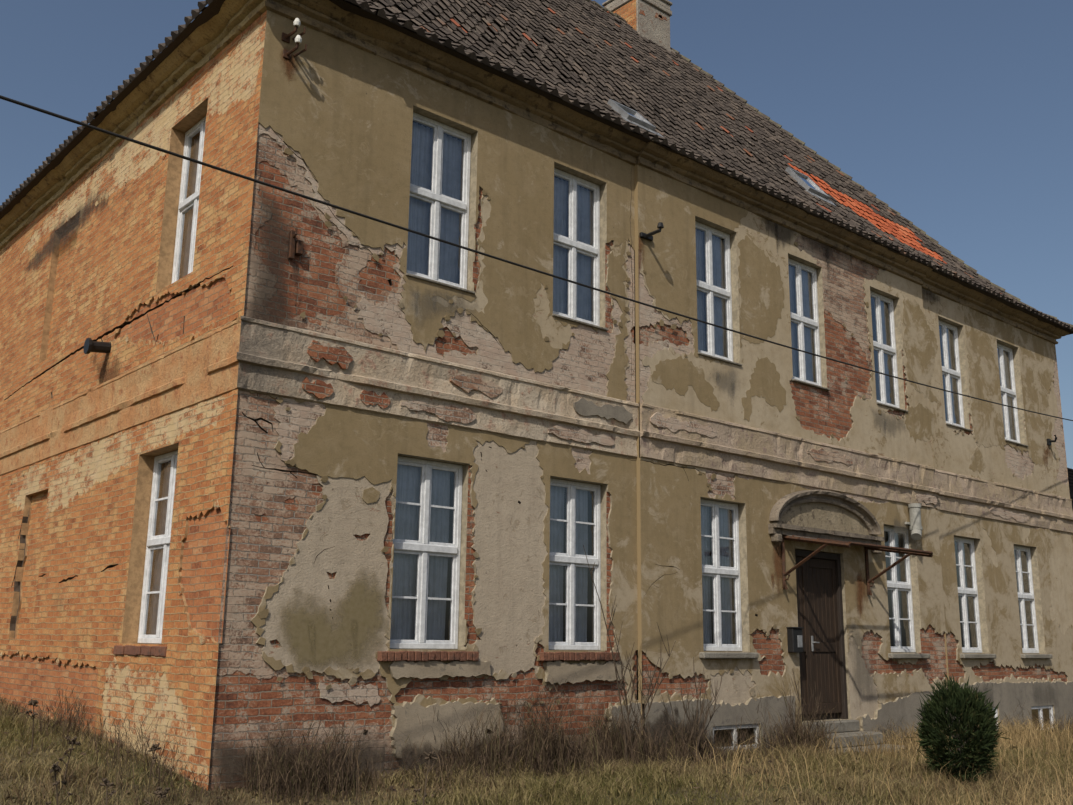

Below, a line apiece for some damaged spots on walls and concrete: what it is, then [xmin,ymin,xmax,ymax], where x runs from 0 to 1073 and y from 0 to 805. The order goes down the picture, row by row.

crack [5,266,233,400]
peeling [114,121,1070,500]
crack [242,412,318,478]
spalling [837,492,889,504]
peeling [916,493,943,512]
peeling [989,508,1039,529]
flaking render [0,377,786,791]
flaking render [848,624,1069,720]